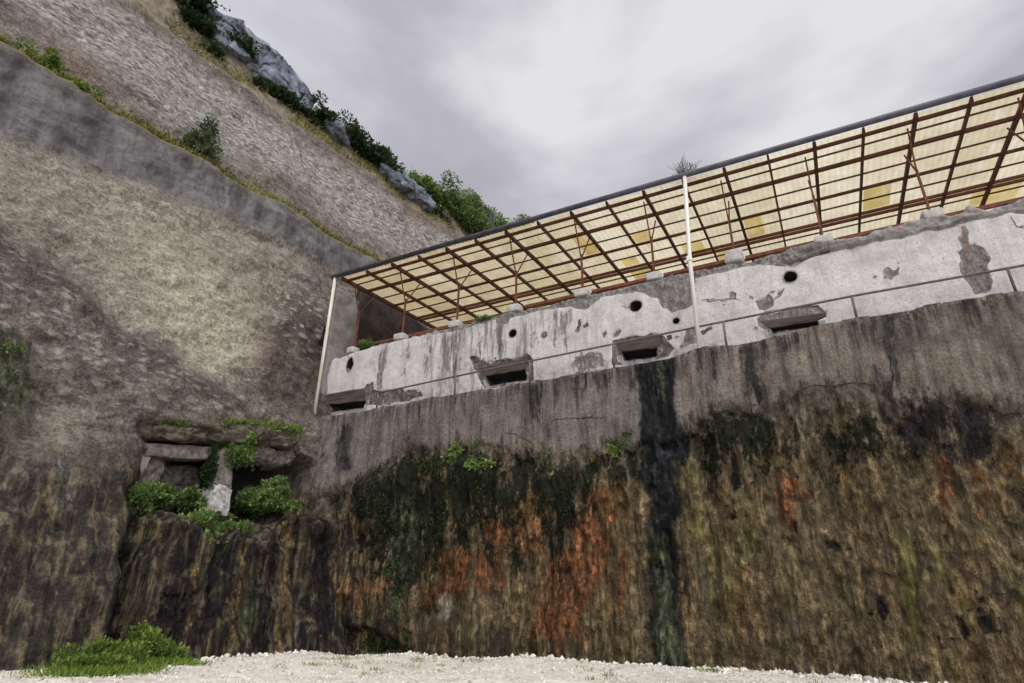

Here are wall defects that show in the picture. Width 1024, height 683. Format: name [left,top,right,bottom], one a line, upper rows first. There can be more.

spalling [440,241,831,333]
spalling [873,262,899,279]
spalling [959,235,993,294]
water stain [375,348,387,385]
water stain [425,330,465,382]
spalling [571,326,712,374]
spalling [364,382,423,406]
water stain [334,423,353,471]
water stain [516,304,1000,667]
corrosion [775,473,809,536]
corrosion [420,480,631,657]